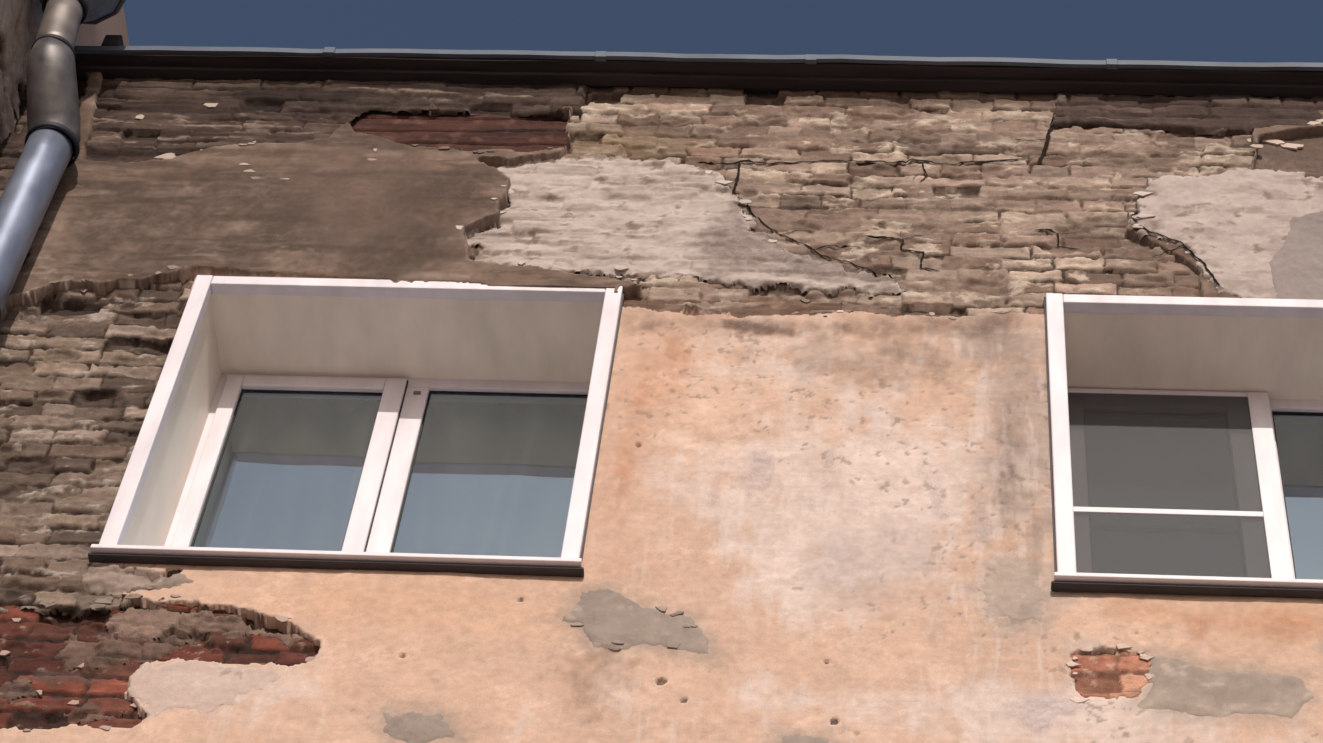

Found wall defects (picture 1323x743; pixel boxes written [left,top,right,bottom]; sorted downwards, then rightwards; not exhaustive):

flaking render [351,86,1323,320]
crack [699,117,1054,279]
flaking render [0,265,320,732]
peeling [608,640,624,651]
peeling [655,606,697,628]
spalling [1066,643,1155,703]